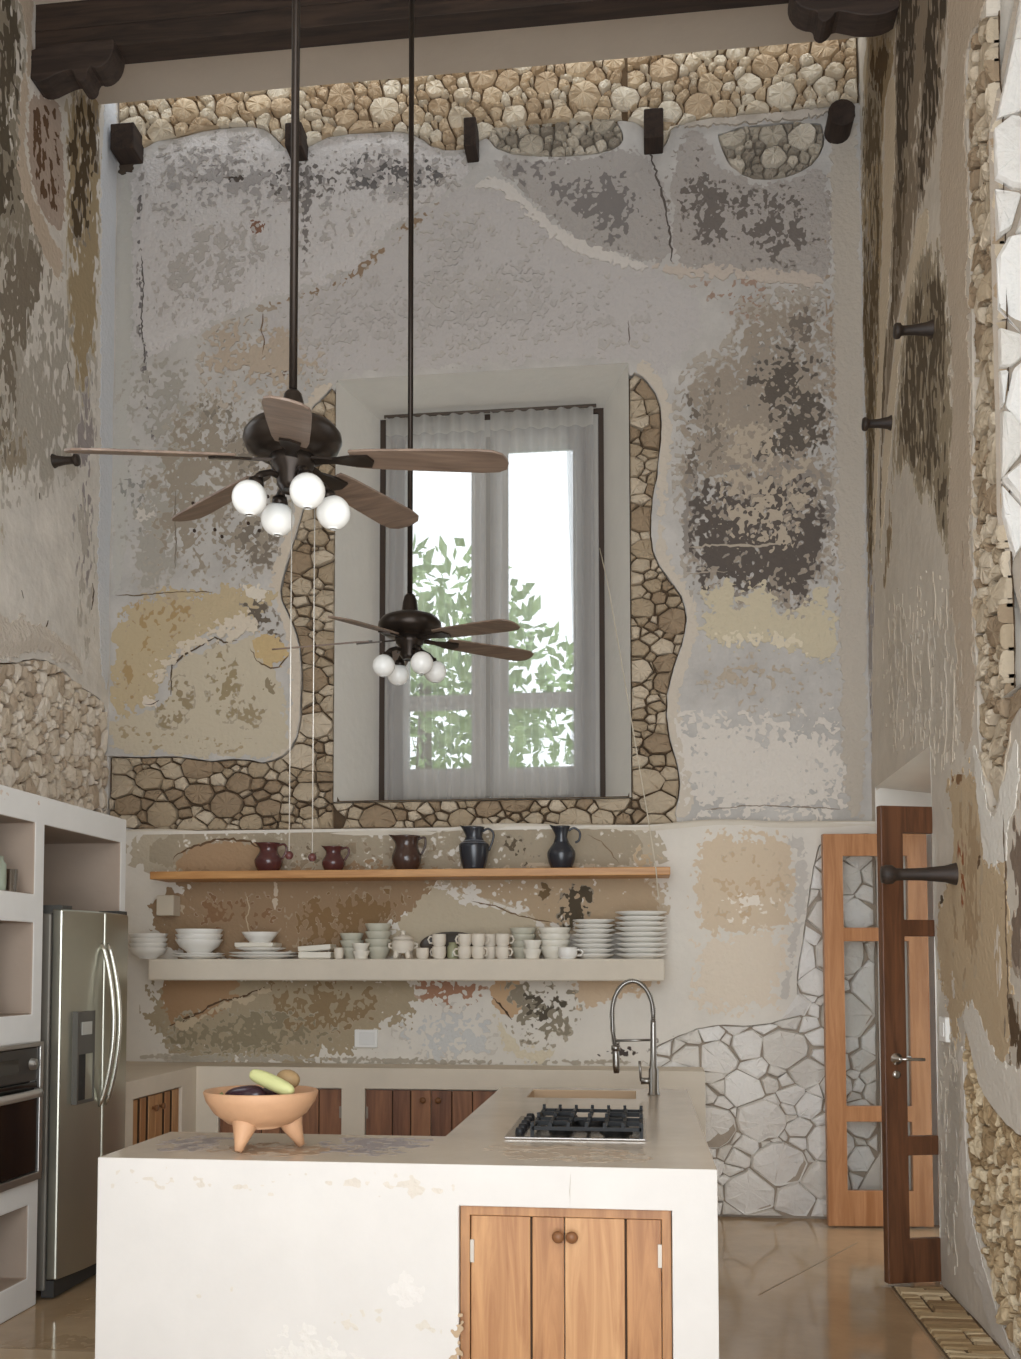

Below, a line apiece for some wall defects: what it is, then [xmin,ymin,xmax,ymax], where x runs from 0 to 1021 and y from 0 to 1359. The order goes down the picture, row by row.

water stain [0,0,102,661]
flaking render [0,375,687,831]
water stain [110,131,671,754]
flaking render [118,38,859,180]
crack [649,154,673,262]
water stain [500,135,841,719]
water stain [861,0,1021,1275]
flaking render [965,10,1021,808]
flaking render [168,987,272,1031]
flaking render [489,981,522,1018]
flaking render [962,1034,1021,1358]